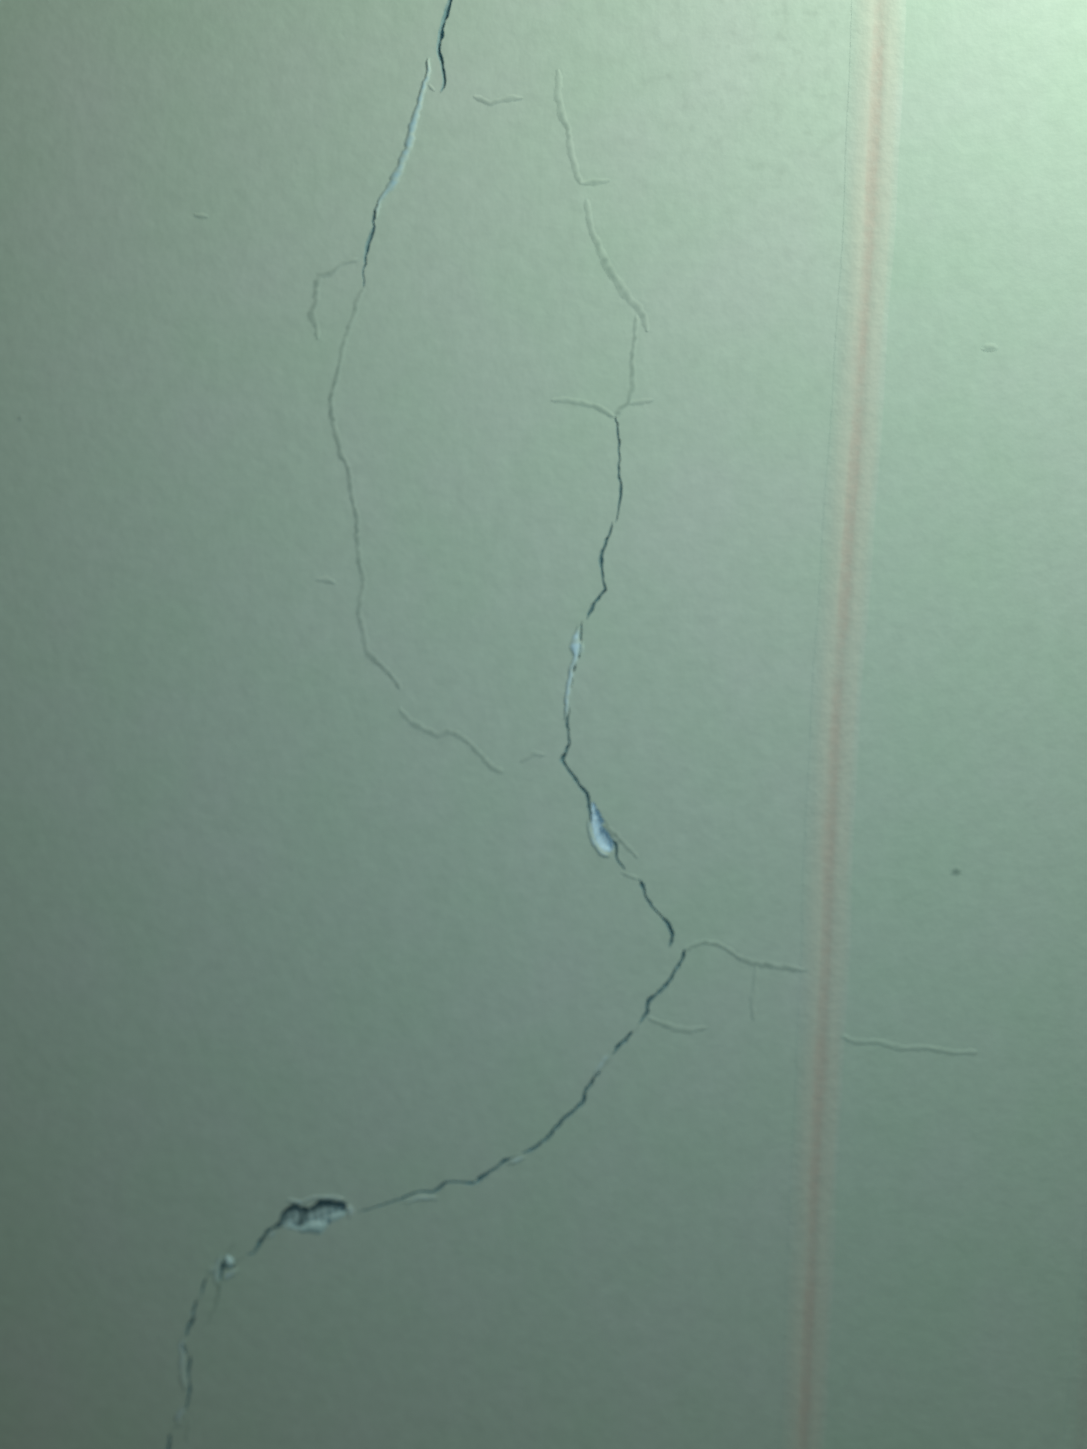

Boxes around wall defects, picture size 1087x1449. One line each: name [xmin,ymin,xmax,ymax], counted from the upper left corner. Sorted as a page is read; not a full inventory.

crack [307,0,809,1212]
crack [166,1224,278,1449]